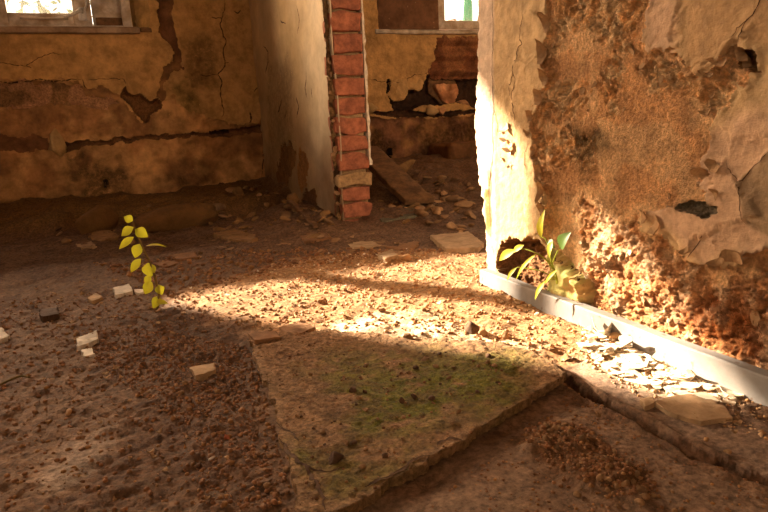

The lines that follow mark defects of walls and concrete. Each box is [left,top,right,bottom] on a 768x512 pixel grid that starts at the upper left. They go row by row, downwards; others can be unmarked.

crack [65,0,268,173]
spalling [357,0,479,165]
spalling [276,140,317,206]
spalling [496,0,768,371]
crack [562,374,768,486]